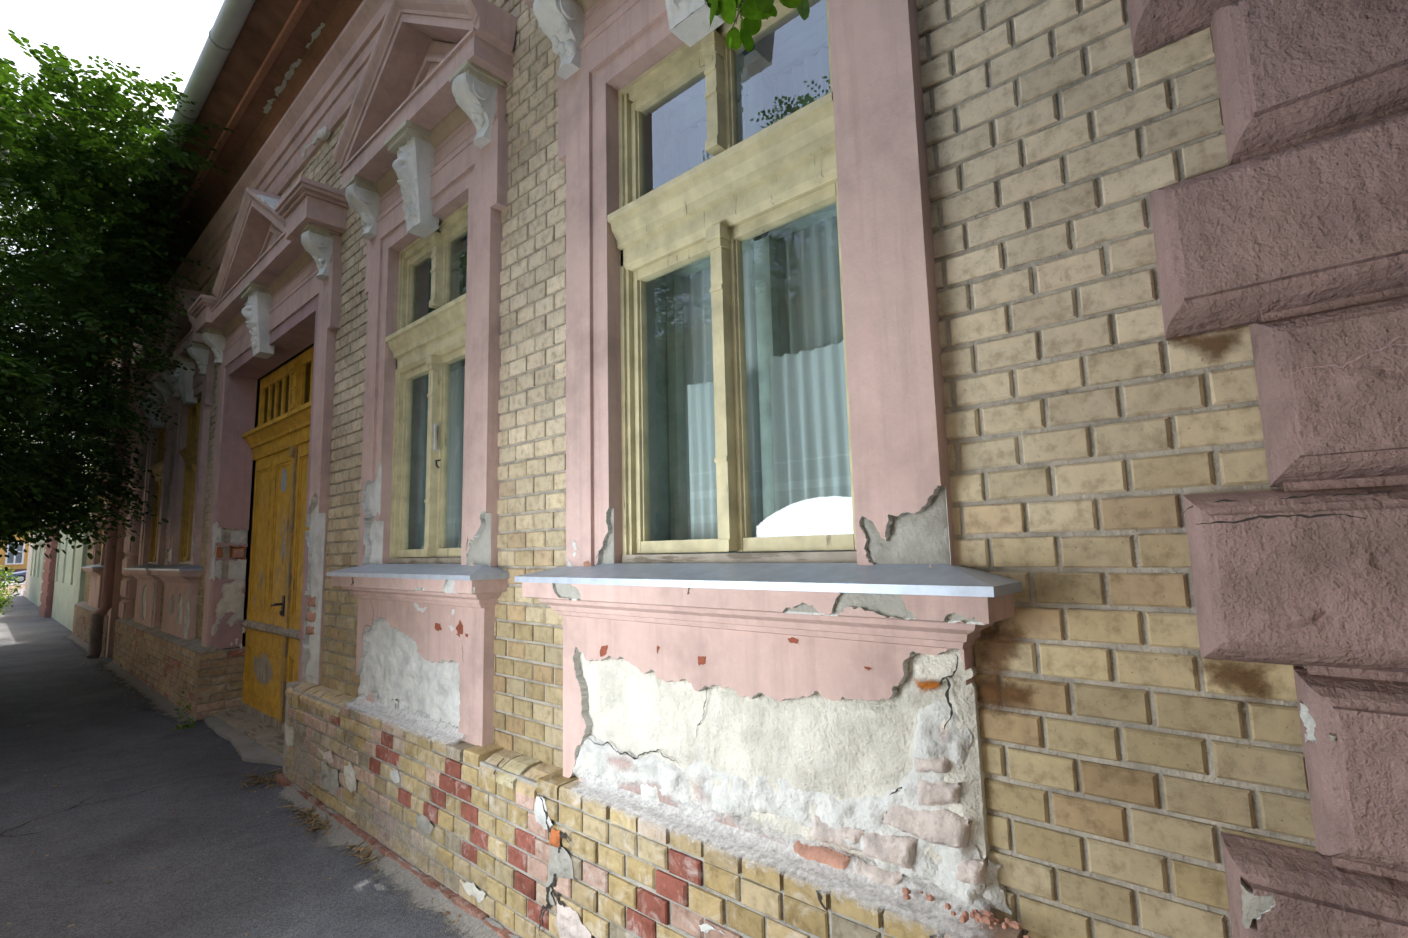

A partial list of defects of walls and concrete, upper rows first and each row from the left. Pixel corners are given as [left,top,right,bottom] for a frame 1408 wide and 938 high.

damp [1171,328,1237,358]
spalling [863,487,950,565]
crack [1183,491,1391,525]
peeling [212,469,288,685]
spalling [305,501,326,680]
spalling [358,618,460,727]
crack [939,653,958,729]
damp [978,626,1029,707]
damp [1205,663,1267,700]
spalling [573,645,1013,914]